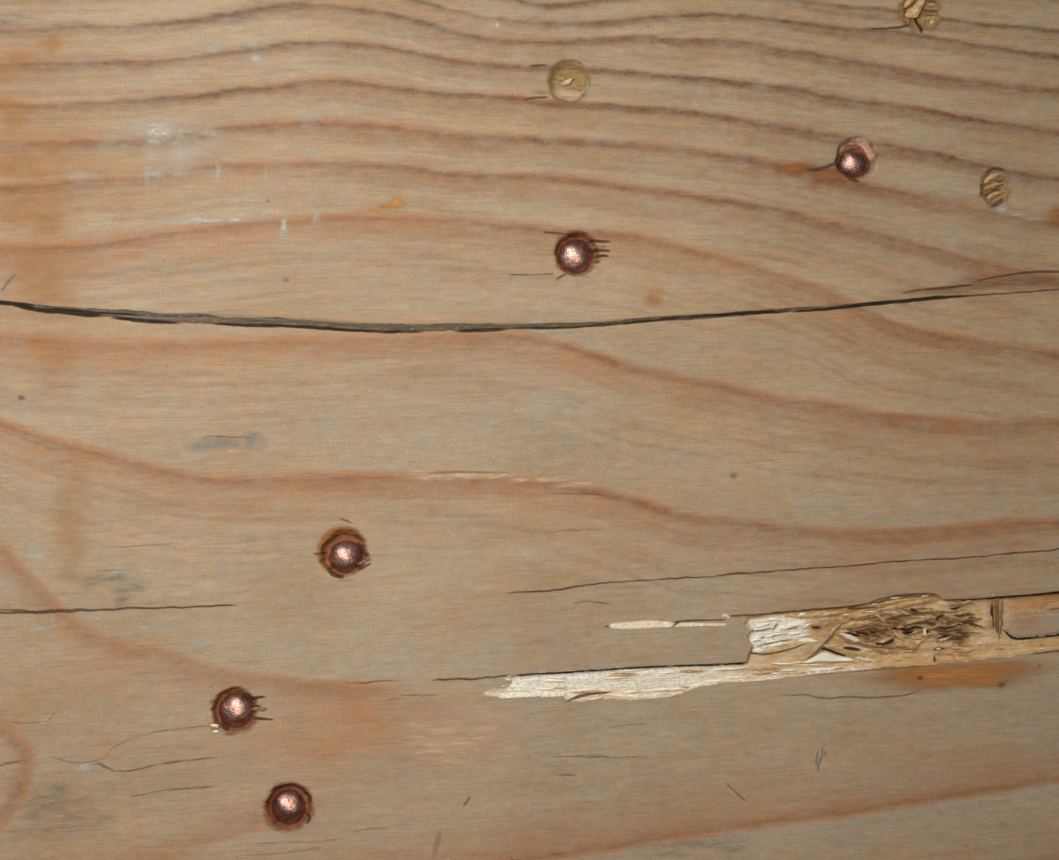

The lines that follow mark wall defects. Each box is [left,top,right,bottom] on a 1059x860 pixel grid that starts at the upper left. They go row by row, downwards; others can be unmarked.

crack [0,270,1059,333]
crack [511,548,1059,594]
crack [0,604,233,614]
spalling [484,591,1059,702]